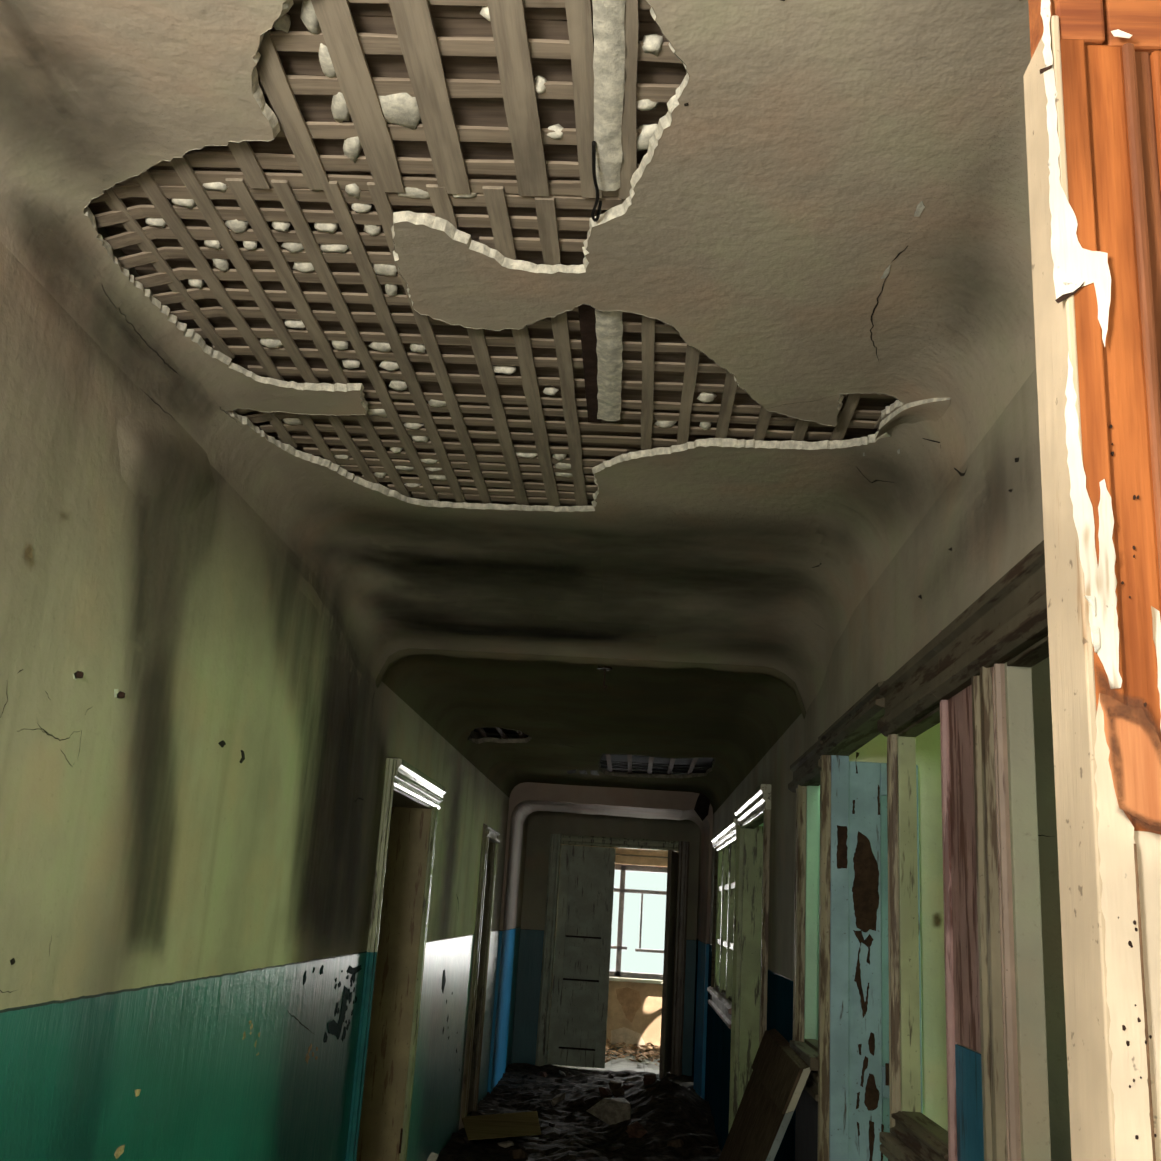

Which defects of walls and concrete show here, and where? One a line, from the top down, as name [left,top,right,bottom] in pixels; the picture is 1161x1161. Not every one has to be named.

spalling [84,0,951,512]
crack [870,245,908,361]
peeling [852,831,879,1018]
peeling [303,965,362,1064]
peeling [856,1032,884,1161]